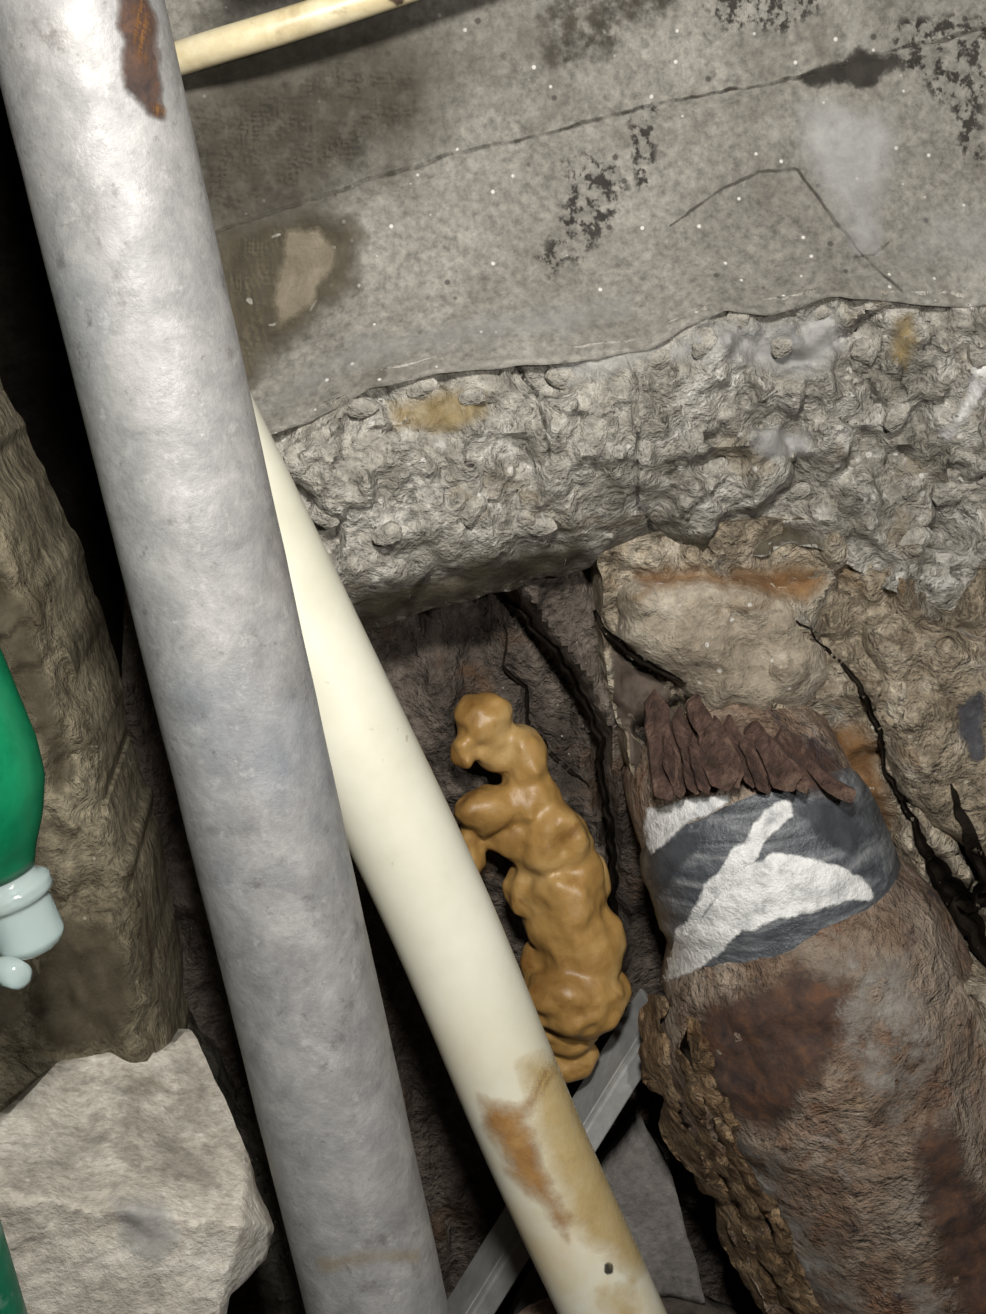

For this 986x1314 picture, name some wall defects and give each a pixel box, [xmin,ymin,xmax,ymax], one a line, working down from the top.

water stain [195,25,428,380]
water stain [538,106,656,274]
crack [559,106,642,131]
crack [684,86,738,100]
crack [670,169,827,226]
mould [715,0,819,31]
mould [799,15,986,160]
spalling [271,284,986,1054]
spalling [122,589,252,1096]
crack [796,620,986,967]
spalling [350,854,506,1300]
spalling [595,1079,763,1314]